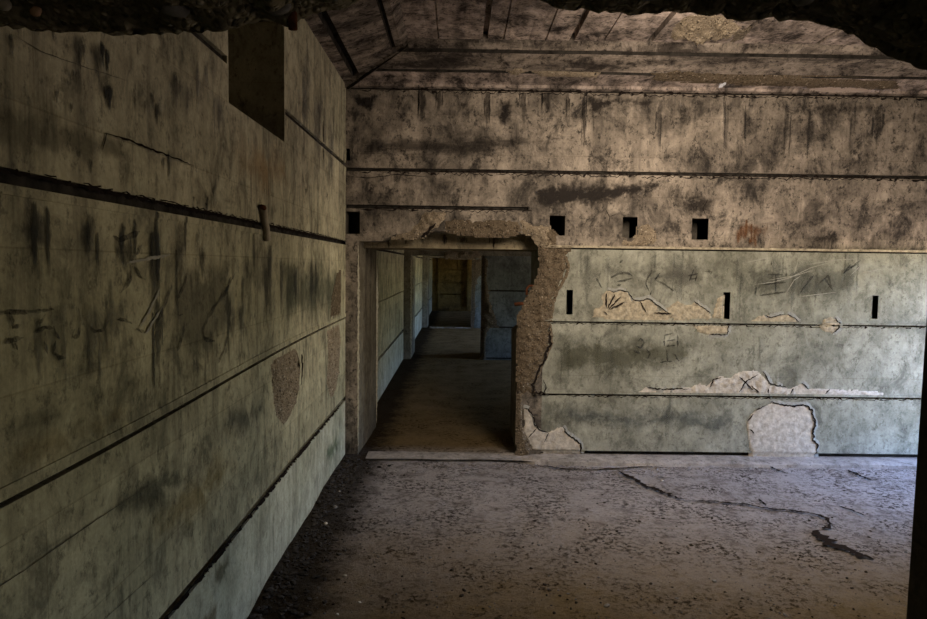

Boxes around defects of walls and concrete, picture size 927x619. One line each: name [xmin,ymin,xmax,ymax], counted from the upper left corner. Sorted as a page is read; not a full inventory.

spalling [622,217,657,246]
spalling [391,211,585,456]
flaking render [593,287,732,338]
flaking render [639,370,883,457]
crack [536,465,874,560]